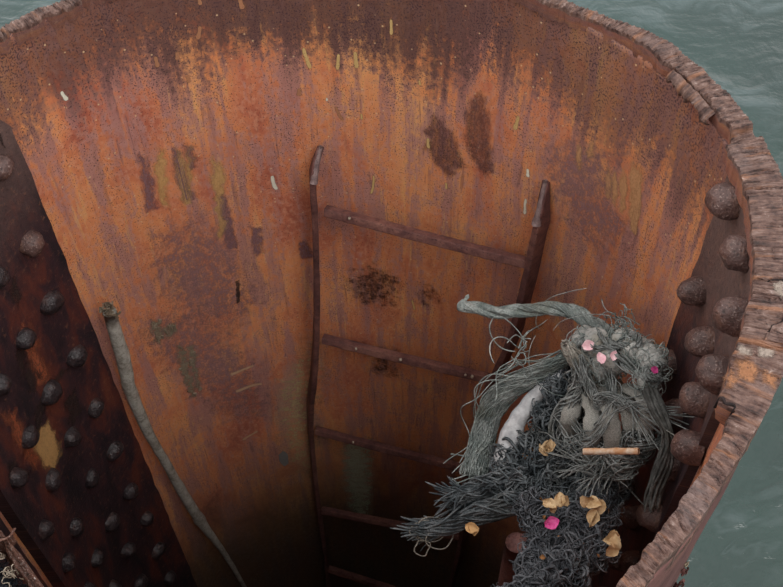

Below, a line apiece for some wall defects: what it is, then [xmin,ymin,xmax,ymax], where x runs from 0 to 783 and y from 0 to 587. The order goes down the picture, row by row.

rust [666,70,715,125]
rust [139,156,158,212]
rust [172,146,196,200]
rust [425,117,463,175]
rust [466,96,493,173]
rust [548,142,625,249]
rust [156,195,255,323]
rust [251,228,263,255]
rust [349,268,396,304]
rust [3,412,59,468]